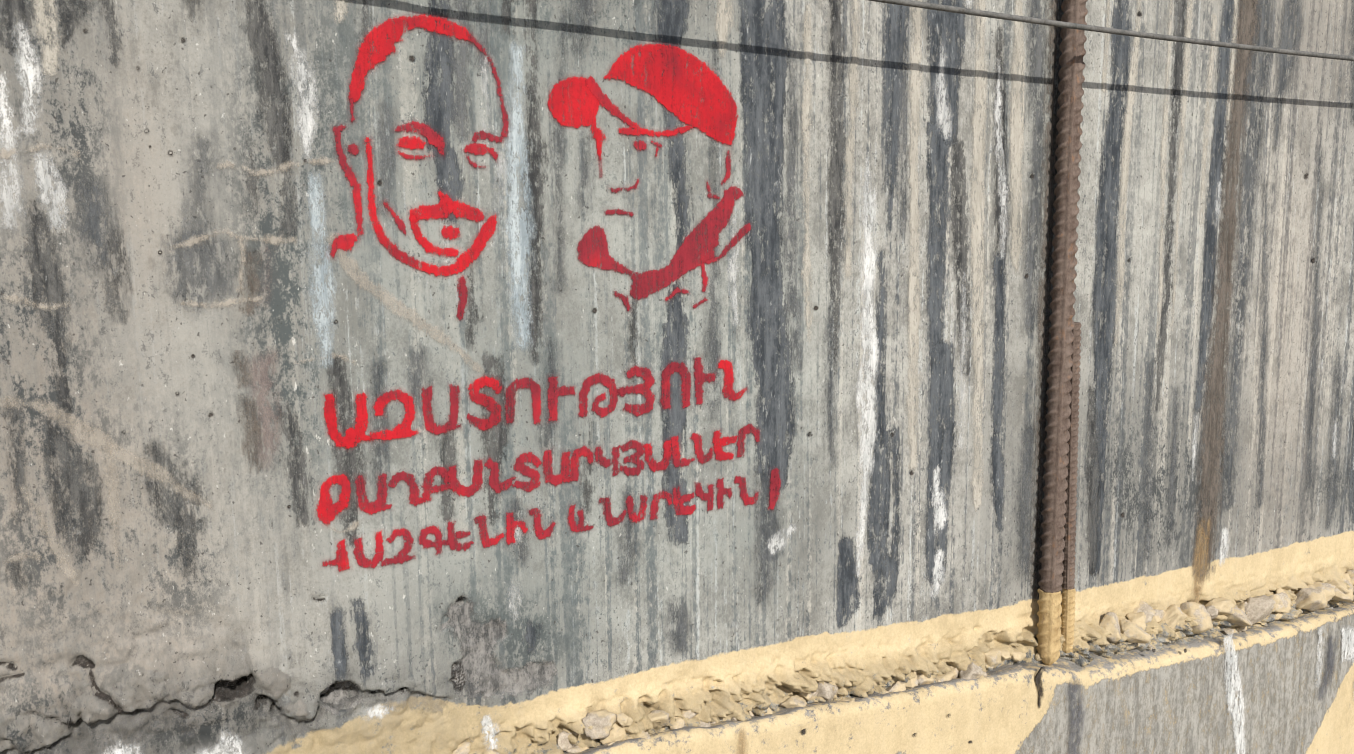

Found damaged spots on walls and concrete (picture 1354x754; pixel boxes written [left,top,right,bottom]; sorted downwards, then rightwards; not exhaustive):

leakage [0,0,132,560]
spalling [208,674,281,711]
spalling [320,681,384,715]
leakage [628,300,639,378]
leakage [706,0,812,603]
leakage [827,0,1047,627]
corrosion [1030,0,1063,597]
leakage [1086,0,1140,575]
corrosion [1193,0,1259,604]
leakage [1307,150,1323,487]
leakage [1326,354,1354,528]